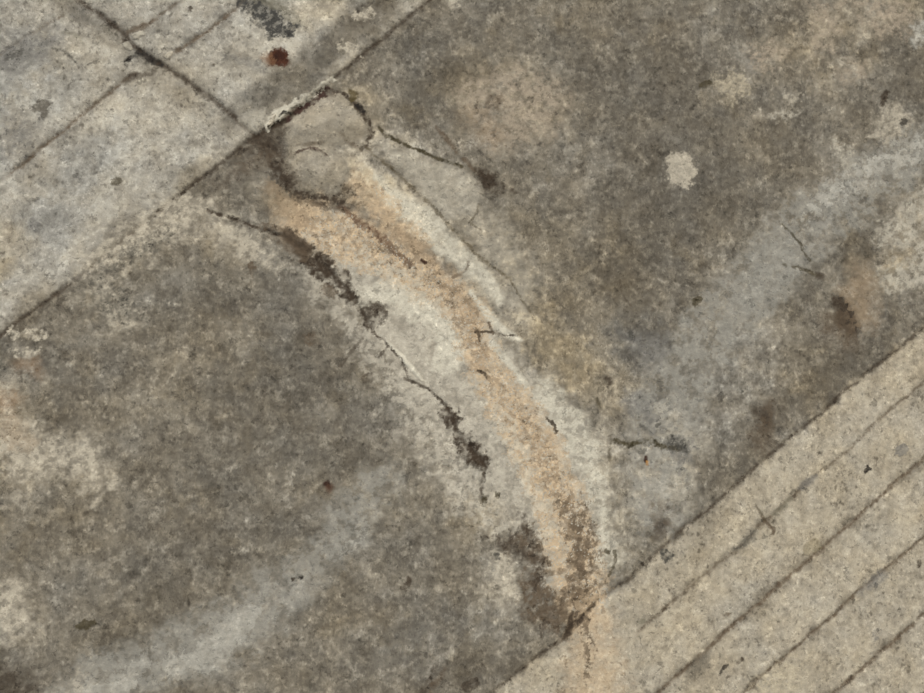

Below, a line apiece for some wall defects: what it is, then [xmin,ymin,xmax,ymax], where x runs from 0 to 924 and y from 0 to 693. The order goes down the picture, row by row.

rust [257,44,292,70]
crack [265,85,532,314]
crack [206,208,491,500]
crack [474,321,516,343]